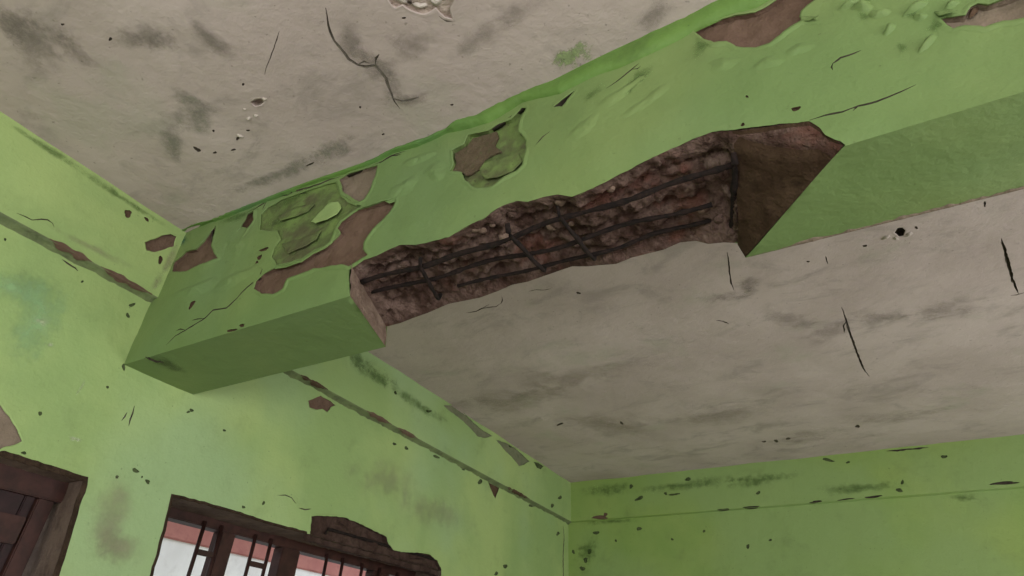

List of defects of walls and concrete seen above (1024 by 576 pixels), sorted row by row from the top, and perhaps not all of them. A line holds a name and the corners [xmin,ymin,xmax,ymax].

crack [326,10,418,109]
peeling [690,0,820,51]
crack [811,85,915,120]
peeling [143,223,229,275]
spalling [237,104,1024,347]
crack [1001,238,1022,296]
crack [146,270,262,363]
crack [841,307,869,376]
spalling [0,400,88,576]
flaking render [150,494,442,576]